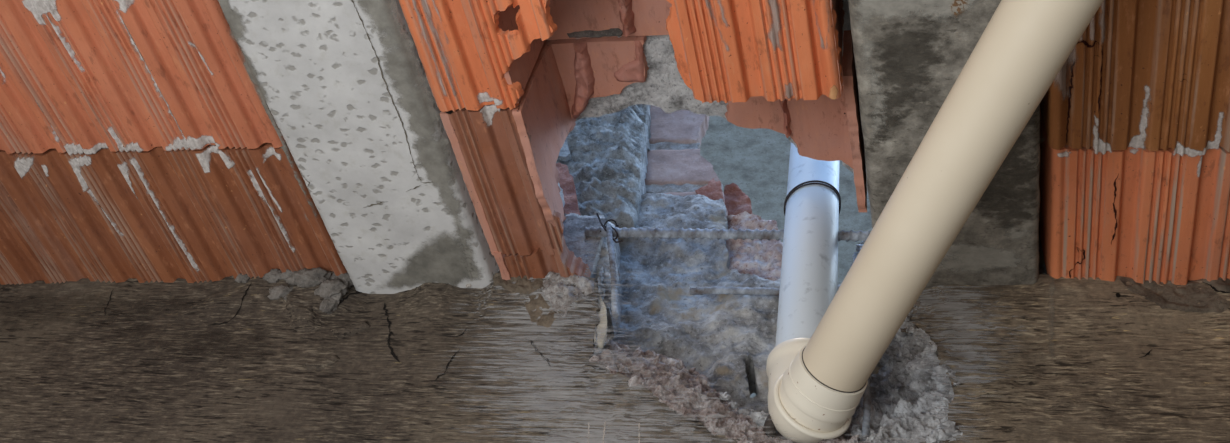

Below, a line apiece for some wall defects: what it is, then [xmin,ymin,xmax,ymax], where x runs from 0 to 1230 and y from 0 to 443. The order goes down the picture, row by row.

spalling [724,183,783,281]
crack [211,284,251,325]
crack [338,291,399,361]
crack [435,329,466,381]
spalling [493,213,797,443]
spalling [818,312,963,443]